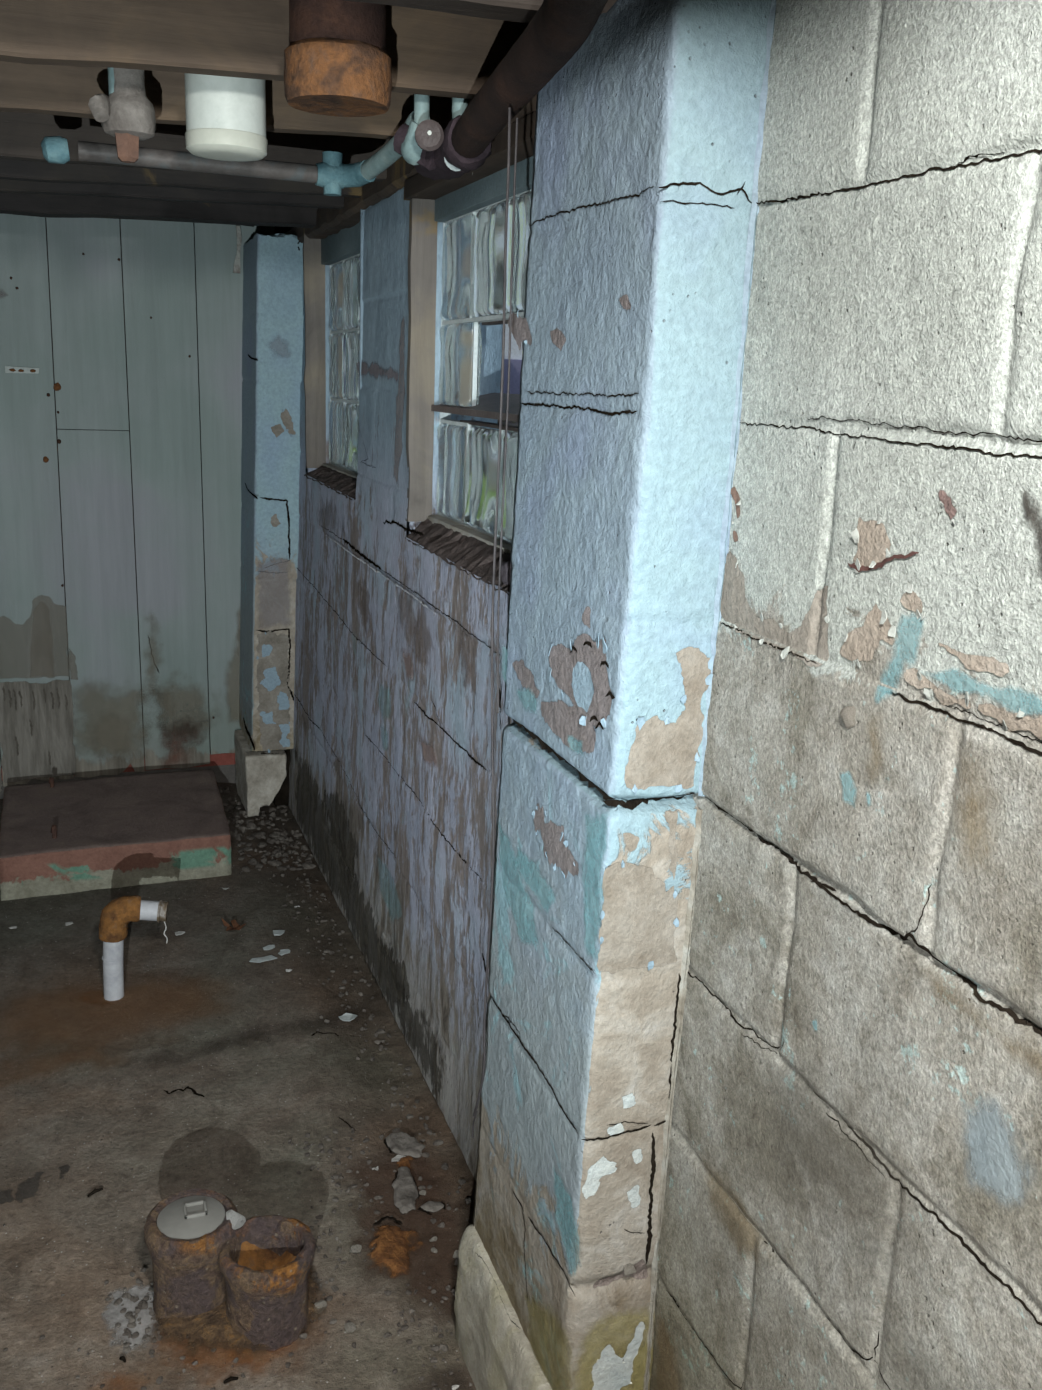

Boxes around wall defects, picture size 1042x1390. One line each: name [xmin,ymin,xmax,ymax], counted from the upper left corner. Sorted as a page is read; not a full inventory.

crack [528,149,1042,226]
crack [740,416,1042,458]
peeling [720,487,898,667]
peeling [848,517,919,573]
water stain [0,596,208,755]
peeling [512,606,615,753]
crack [243,483,1042,1036]
peeling [904,668,1042,740]
rust [12,986,202,1071]
crack [490,972,784,1264]
spalling [593,1259,648,1288]
crack [812,1089,1042,1326]